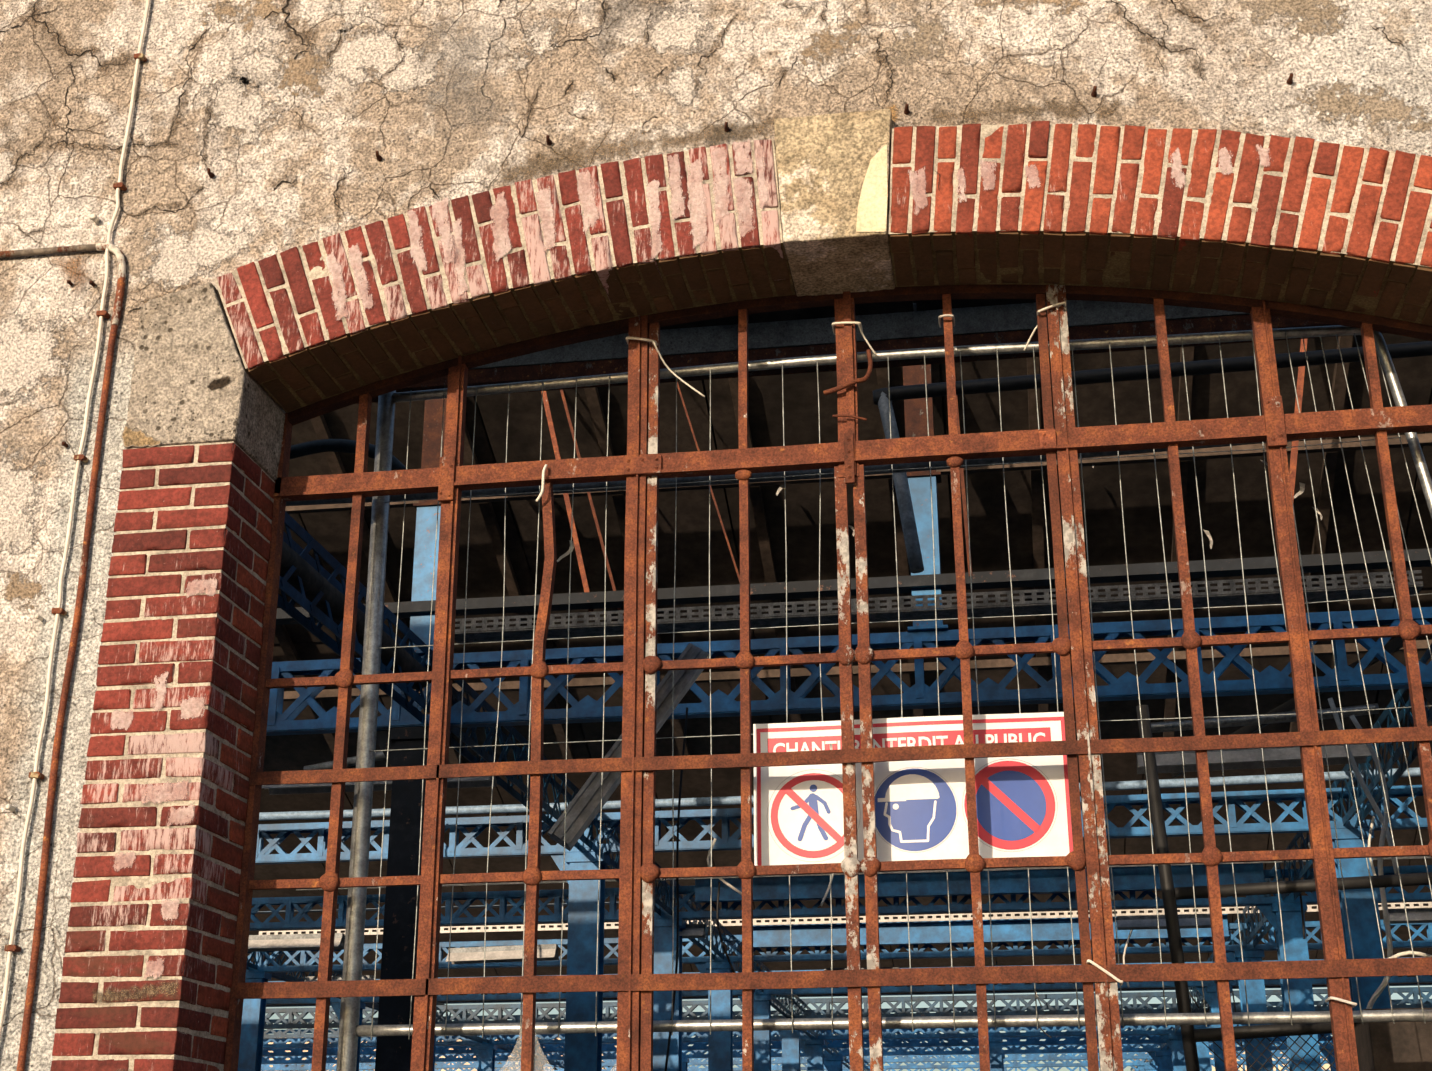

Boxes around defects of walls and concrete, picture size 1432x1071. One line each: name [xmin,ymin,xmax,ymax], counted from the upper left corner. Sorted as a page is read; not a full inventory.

crack [264,0,354,64]
crack [1102,0,1233,83]
crack [0,0,218,217]
crack [333,168,353,226]